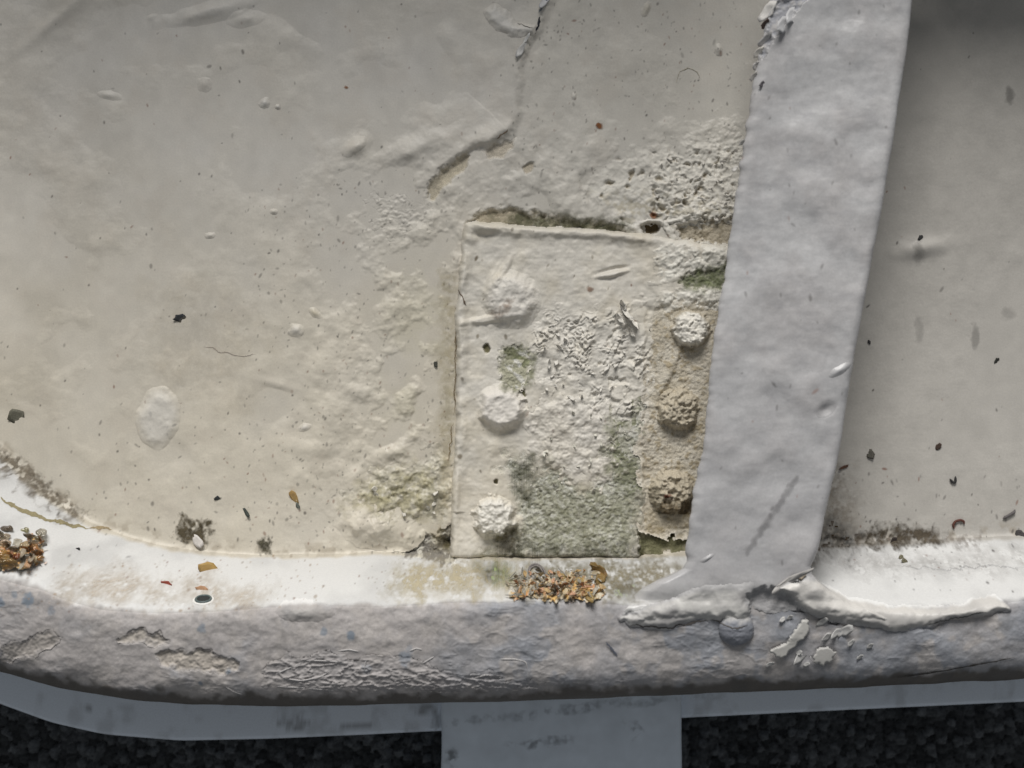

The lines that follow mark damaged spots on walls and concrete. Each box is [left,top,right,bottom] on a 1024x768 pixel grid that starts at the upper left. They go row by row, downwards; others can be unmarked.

peeling [749,0,806,87]
peeling [466,122,745,558]
damp [511,454,534,504]
spalling [1,628,62,665]
spalling [116,628,242,695]
spalling [261,648,552,701]
peeling [617,568,1012,668]